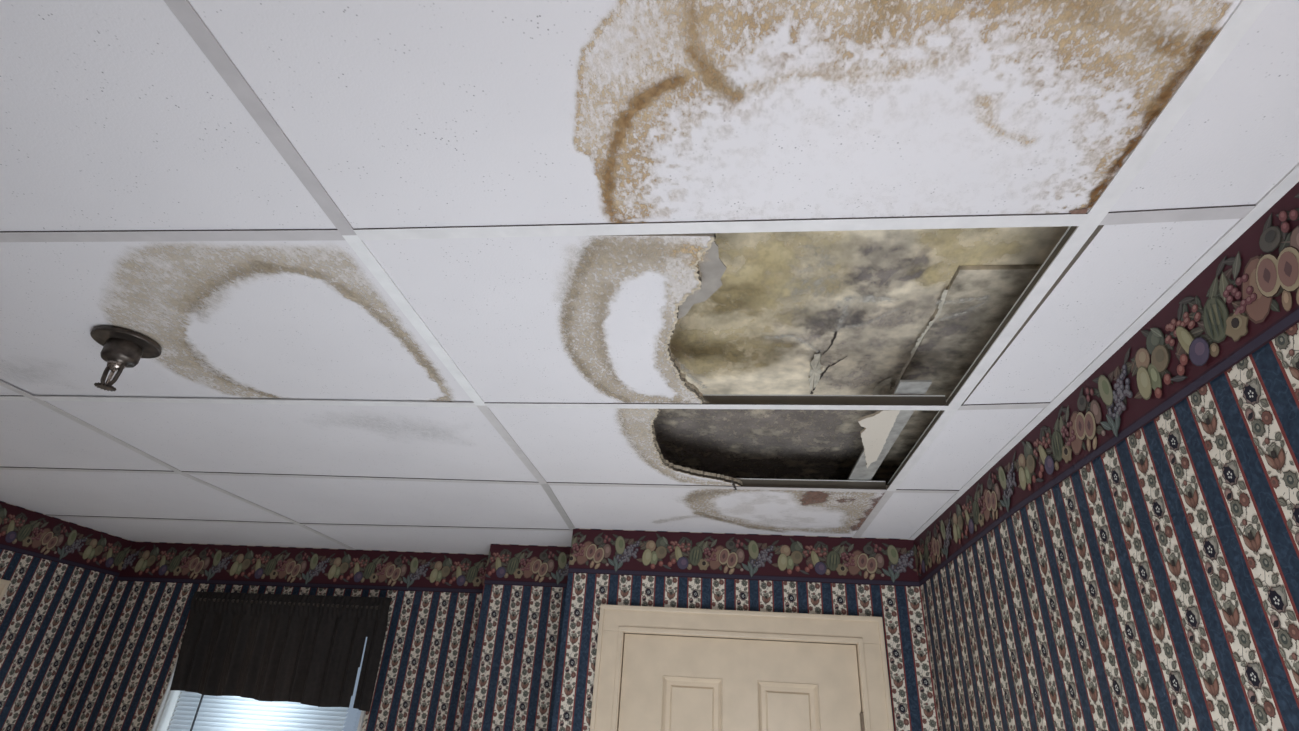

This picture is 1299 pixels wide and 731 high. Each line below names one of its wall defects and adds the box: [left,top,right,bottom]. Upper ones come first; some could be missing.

damp [108,246,451,402]
damp [562,0,1230,533]
spalling [858,410,900,468]